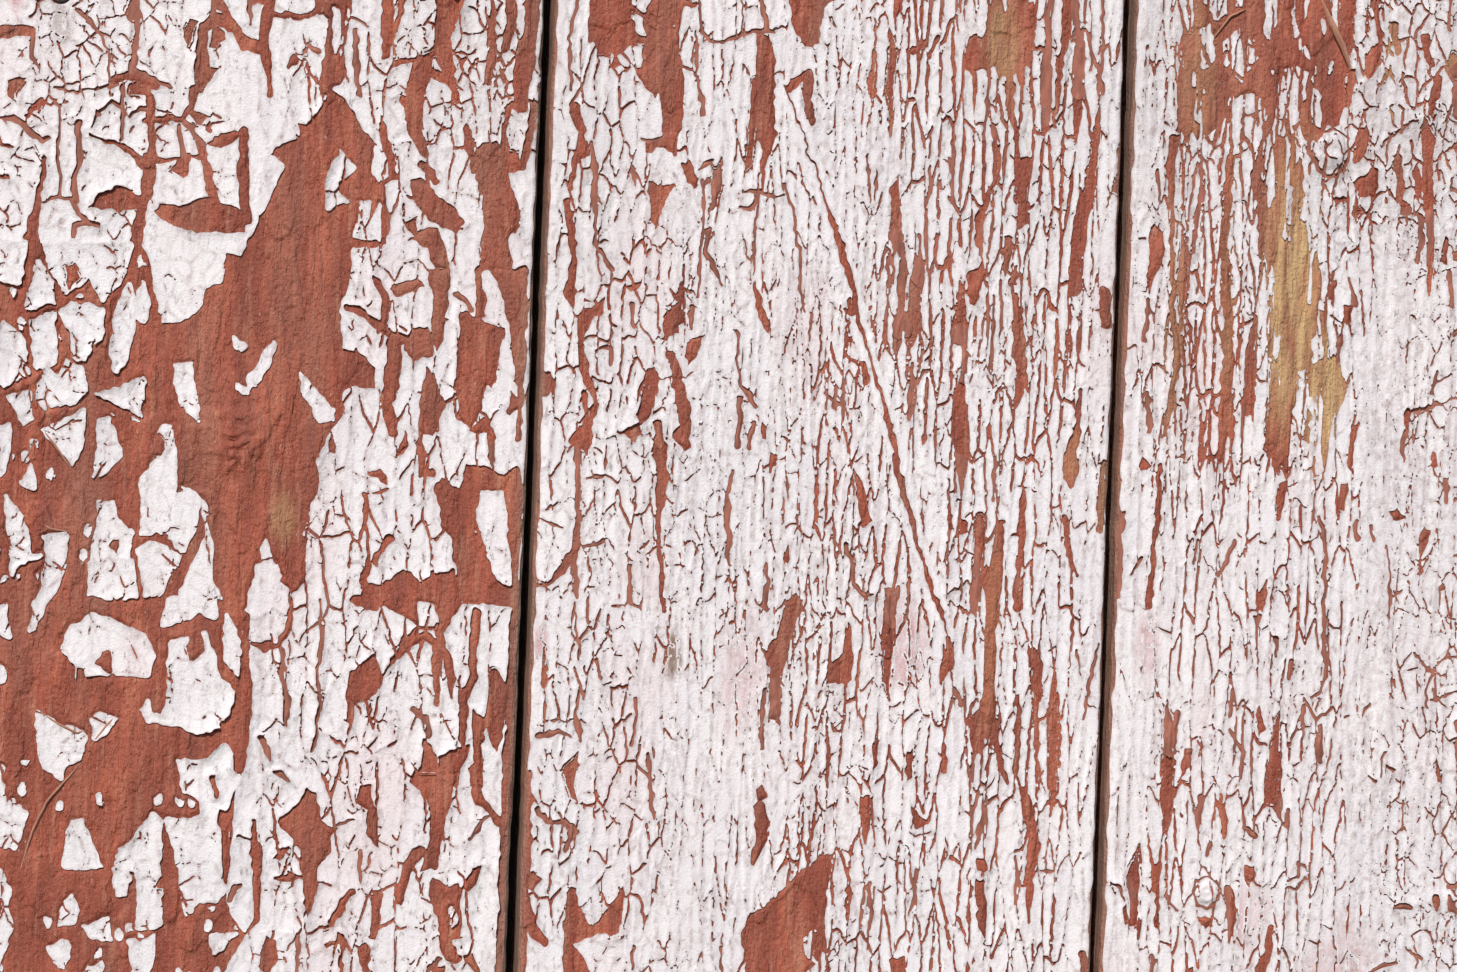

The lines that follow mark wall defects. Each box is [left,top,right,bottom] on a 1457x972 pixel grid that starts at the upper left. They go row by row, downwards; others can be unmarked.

peeling [0,0,705,972]
crack [529,442,666,829]
crack [685,0,817,620]
peeling [755,524,814,680]
peeling [744,0,845,196]
peeling [733,727,948,972]
crack [834,447,1006,629]
crack [863,70,1006,434]
peeling [885,0,1107,933]
crack [1034,0,1113,128]
crack [1105,504,1457,972]
peeling [1133,0,1457,620]